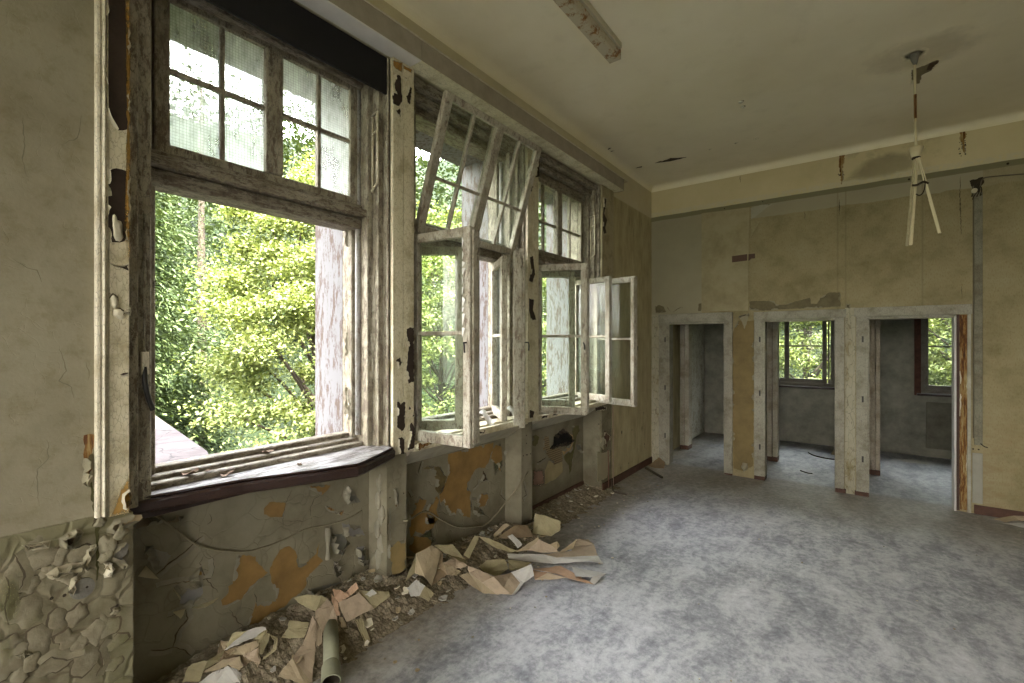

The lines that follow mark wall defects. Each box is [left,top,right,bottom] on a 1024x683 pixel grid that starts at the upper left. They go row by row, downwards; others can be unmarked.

corrosion [958,131,967,156]
peeling [106,168,131,242]
flaking render [733,292,851,472]
peeling [22,489,142,595]
peeling [221,524,369,625]
peeling [343,483,360,505]
peeling [387,430,503,577]
peeling [532,425,580,484]